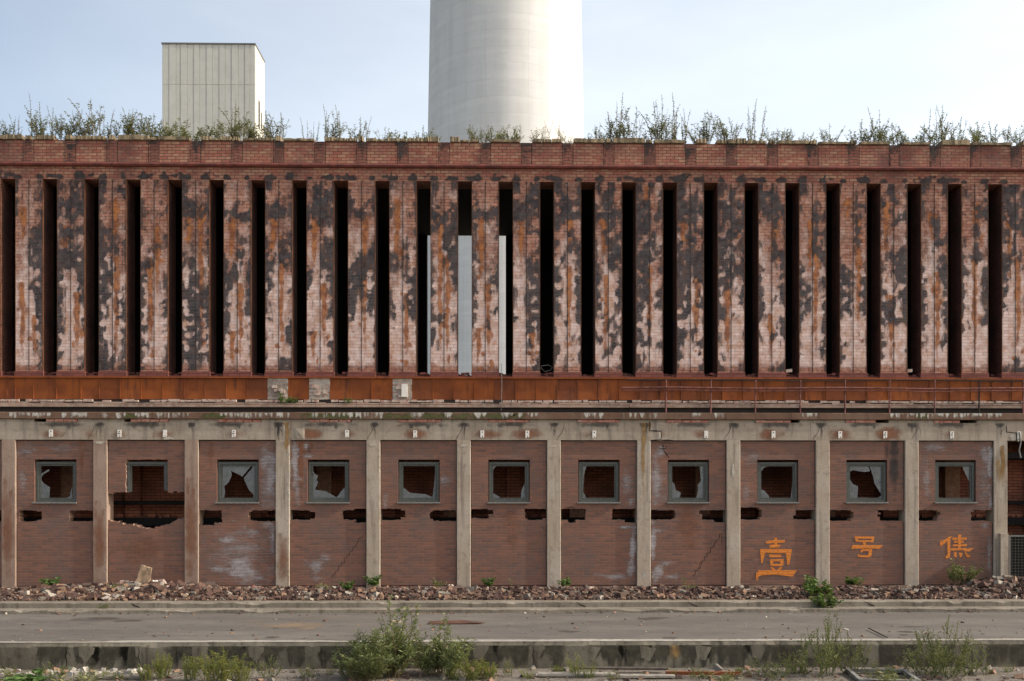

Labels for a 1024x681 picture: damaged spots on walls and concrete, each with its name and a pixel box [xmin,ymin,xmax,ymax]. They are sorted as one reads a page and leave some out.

water stain [266,241,292,366]
water stain [307,227,333,366]
water stain [348,229,375,366]
water stain [390,209,416,366]
water stain [513,250,540,367]
water stain [554,239,581,366]
water stain [636,276,662,367]
water stain [718,245,744,367]
water stain [759,239,785,366]
water stain [840,255,866,367]
water stain [962,227,988,367]
water stain [1002,231,1024,367]